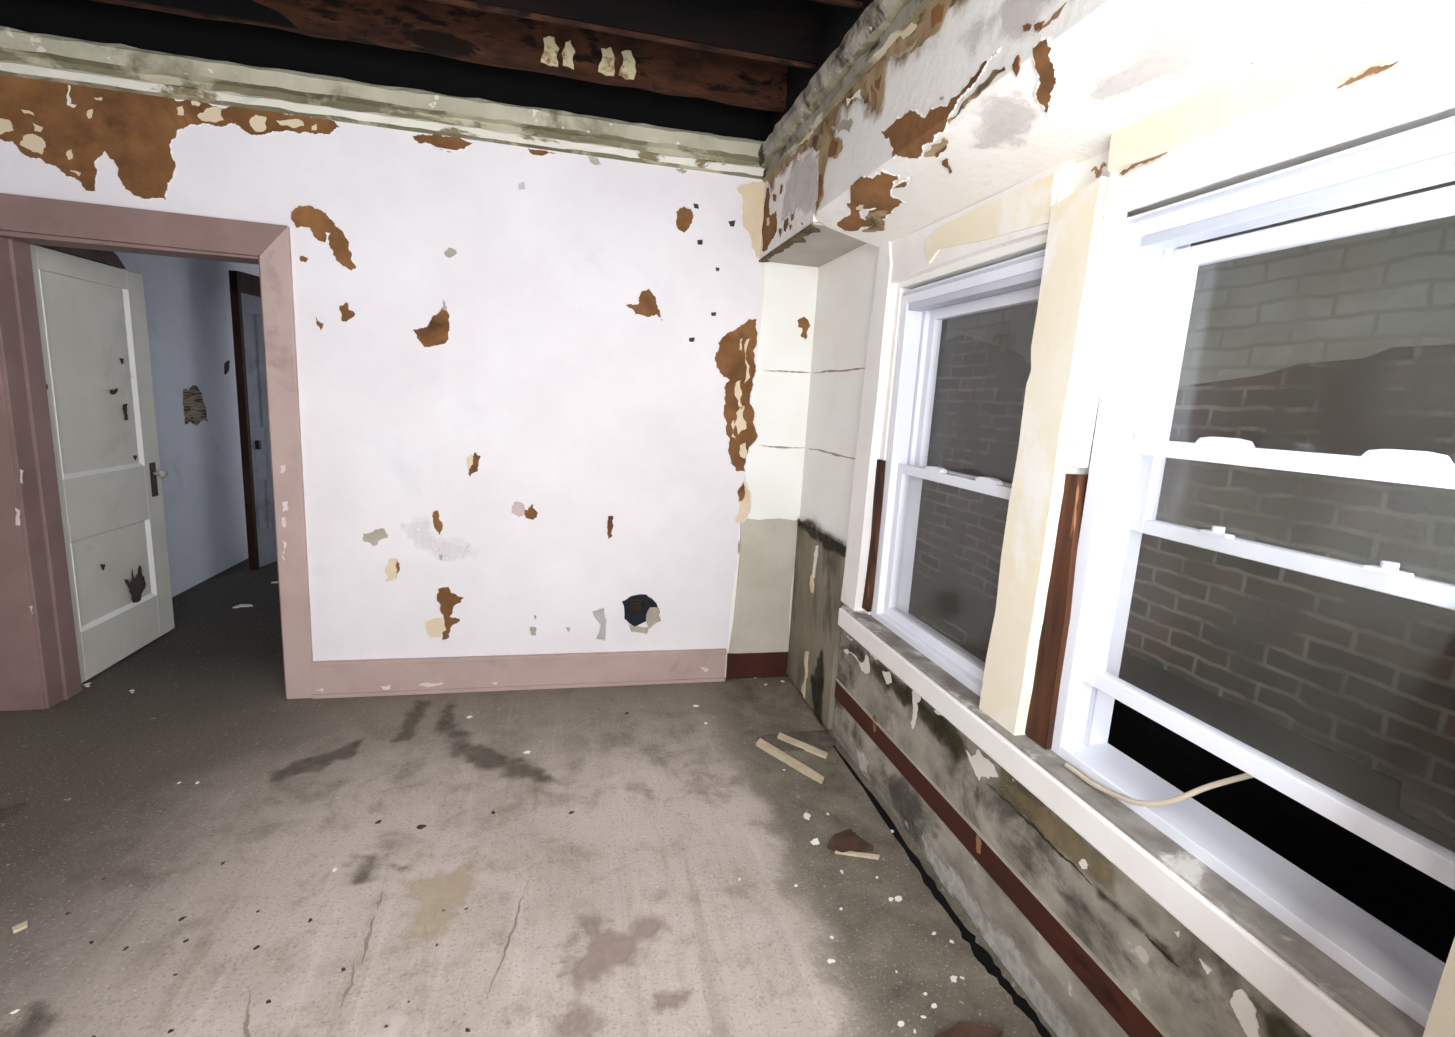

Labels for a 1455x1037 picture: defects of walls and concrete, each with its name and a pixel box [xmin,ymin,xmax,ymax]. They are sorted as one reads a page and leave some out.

peeling [0,75,342,201]
peeling [728,0,1060,260]
peeling [289,204,358,272]
peeling [411,300,452,349]
peeling [713,318,759,524]
leakage [797,519,845,555]
peeling [425,585,466,641]
leakage [811,651,824,725]
leakage [848,647,966,759]
leakage [1000,773,1172,960]
leakage [905,820,1074,1037]
leakage [1265,1015,1301,1037]